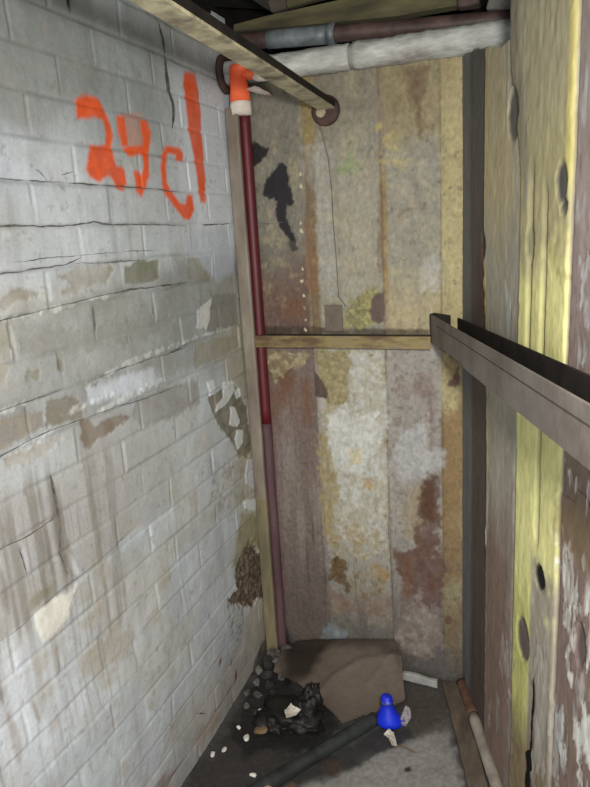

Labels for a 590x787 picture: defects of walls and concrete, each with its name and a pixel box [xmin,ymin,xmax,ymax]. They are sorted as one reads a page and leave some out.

crack [158,22,175,129]
crack [0,250,160,275]
crack [0,220,230,228]
peeling [0,257,256,520]
rust [268,370,323,445]
damp [27,474,82,649]
spalling [224,545,263,653]
rust [315,466,454,625]
damp [74,626,138,684]
peeling [529,536,590,787]
damp [0,667,24,769]
crack [525,677,535,787]